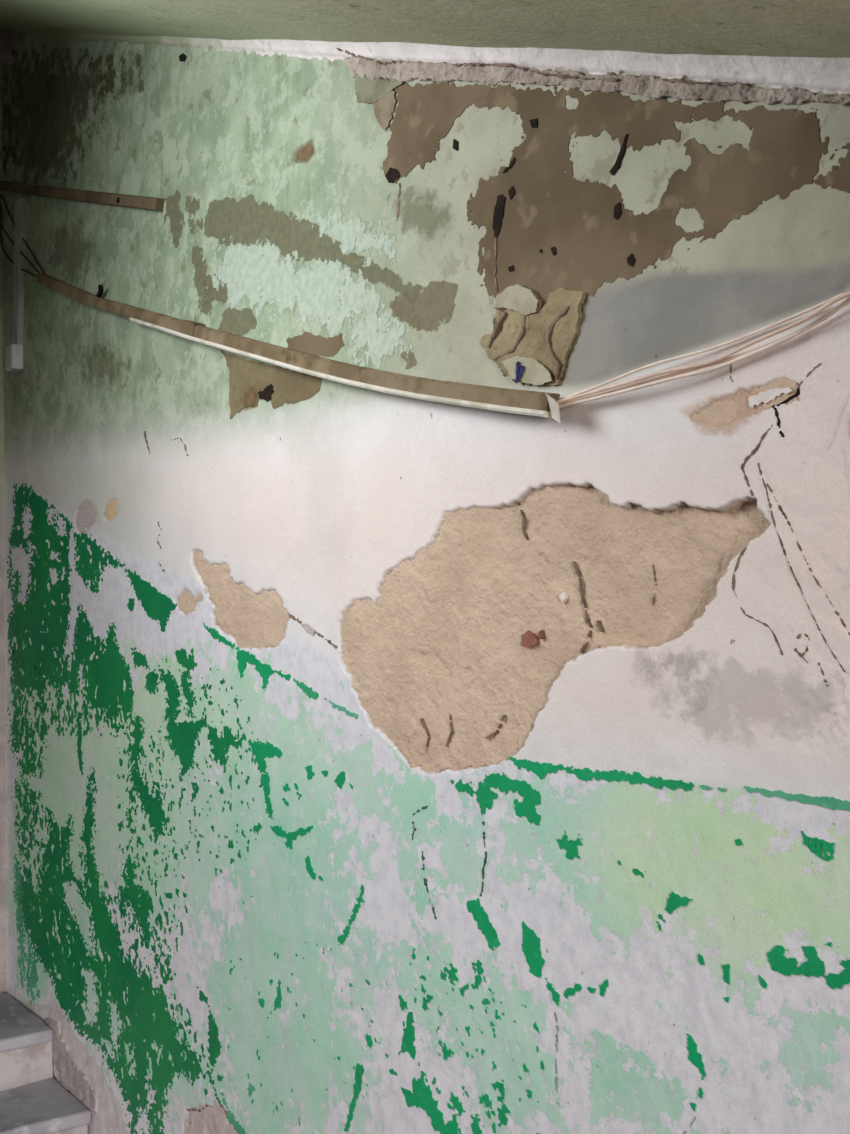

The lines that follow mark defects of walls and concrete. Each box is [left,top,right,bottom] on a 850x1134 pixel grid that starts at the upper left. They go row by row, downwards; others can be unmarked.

water stain [3,46,144,184]
water stain [164,190,458,369]
peeling [337,48,850,388]
peeling [221,350,323,420]
crack [732,425,850,687]
flaking render [5,482,771,1134]
peeling [744,786,850,811]
peeling [801,831,835,861]
peeling [759,942,850,989]